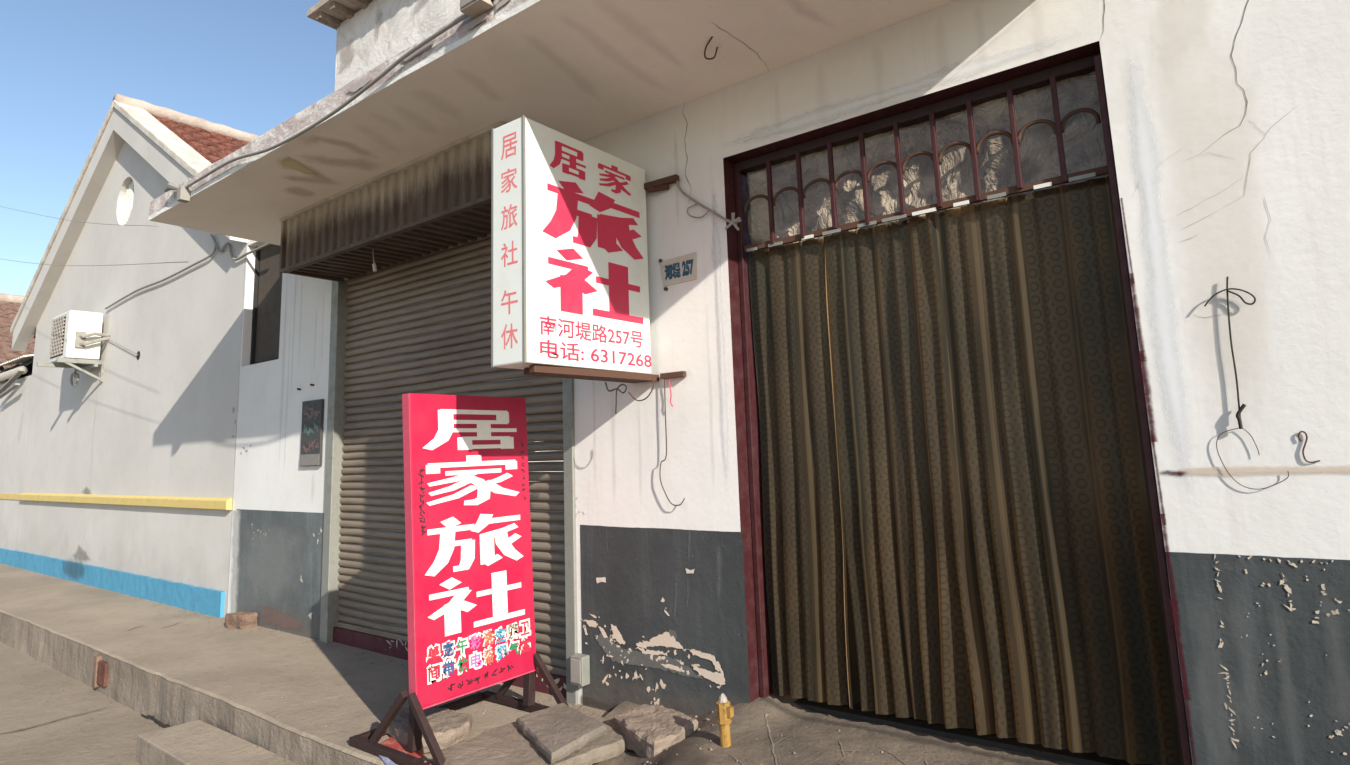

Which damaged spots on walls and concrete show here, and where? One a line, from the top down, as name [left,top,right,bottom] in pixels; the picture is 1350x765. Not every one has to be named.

crack [1132,0,1301,248]
peeling [1239,555,1350,624]
peeling [581,597,725,705]
peeling [1218,665,1239,749]